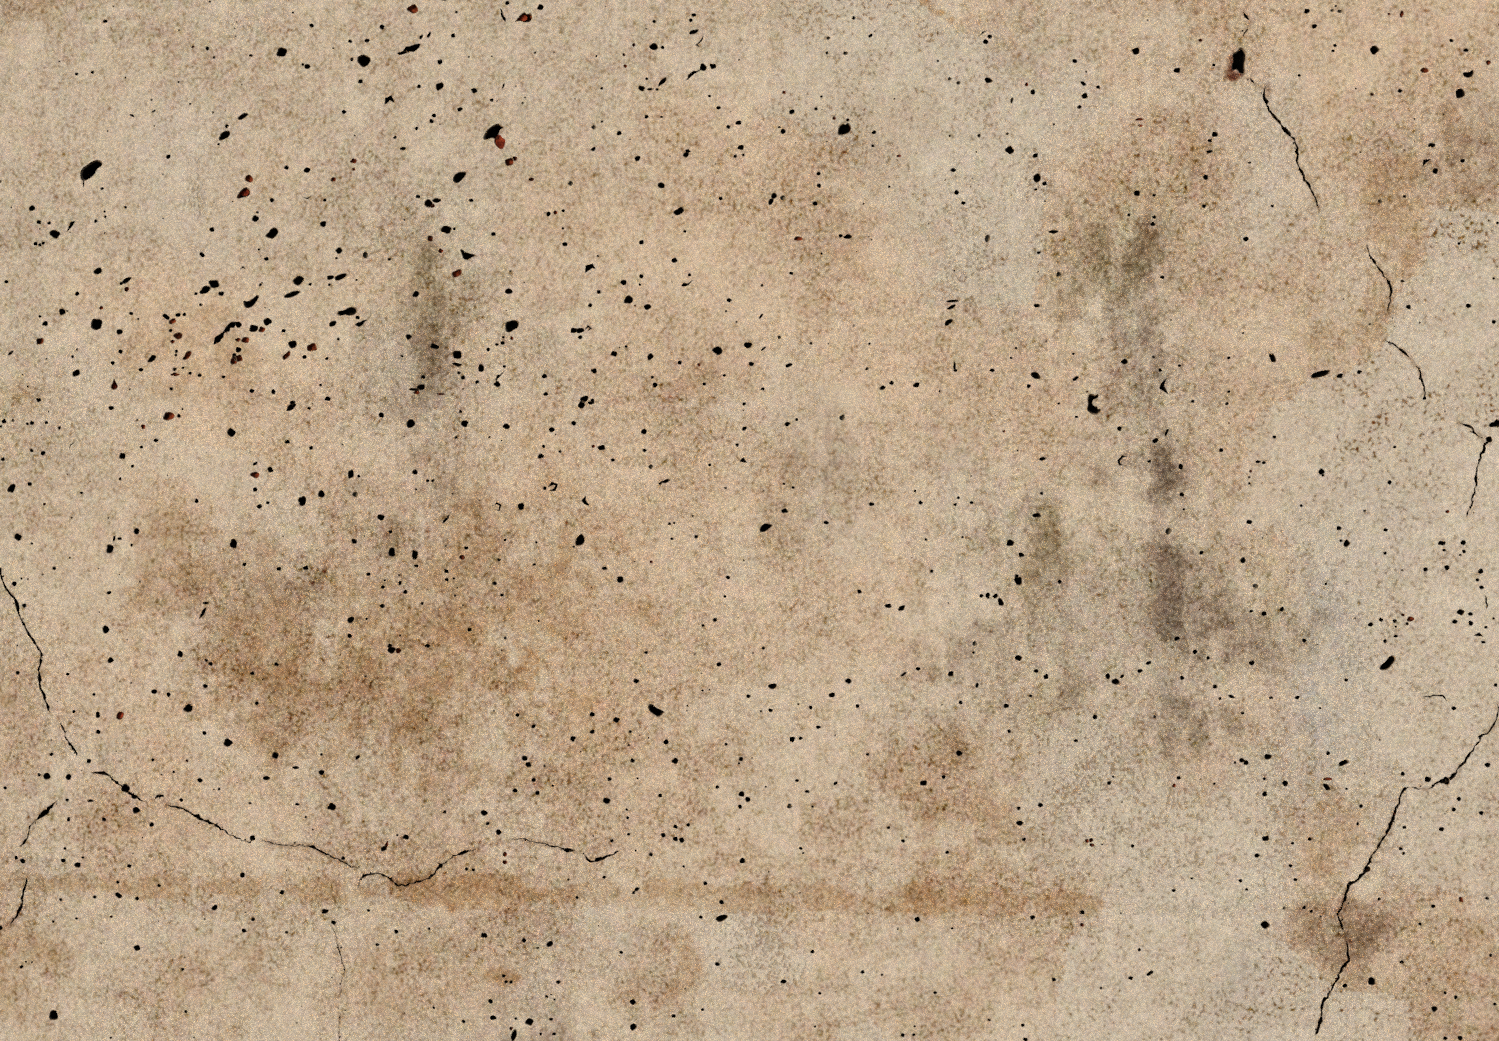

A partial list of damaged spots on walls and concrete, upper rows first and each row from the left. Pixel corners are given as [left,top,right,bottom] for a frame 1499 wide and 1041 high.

crack [1250,78,1319,208]
crack [1366,246,1426,399]
crack [1460,423,1489,516]
crack [0,568,476,888]
crack [0,800,58,930]
crack [514,838,620,863]
crack [1315,704,1499,1035]